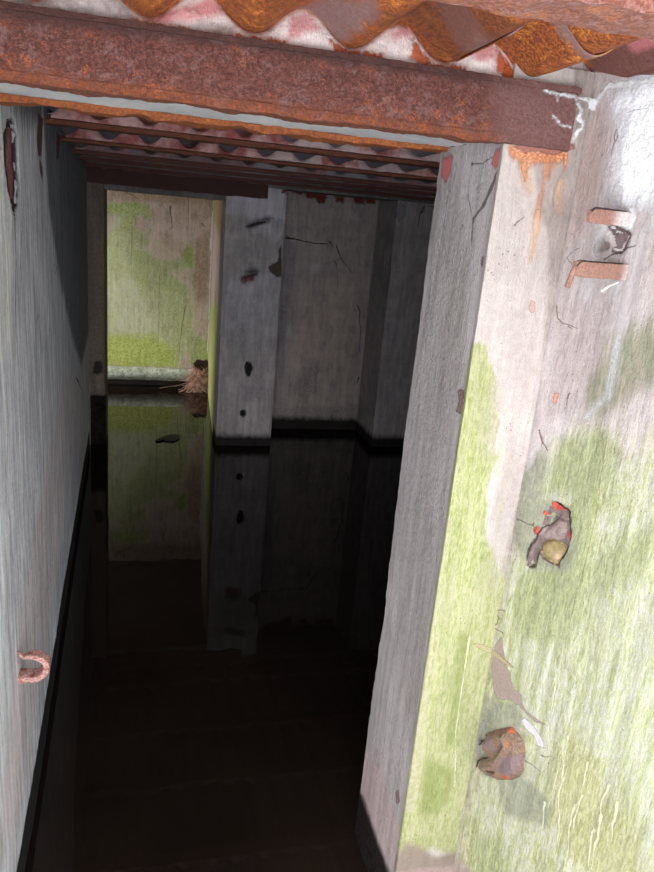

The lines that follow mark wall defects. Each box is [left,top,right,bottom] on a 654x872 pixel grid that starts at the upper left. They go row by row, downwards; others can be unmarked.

rust [330,39,383,58]
rust [410,44,466,70]
rust [496,51,513,78]
crack [462,159,497,246]
rust [508,144,574,245]
leakage [545,75,654,230]
crack [285,235,351,271]
spalling [526,501,572,568]
peeling [475,637,545,748]
leakage [354,793,389,872]
leakage [540,734,589,865]
leakage [587,783,619,870]